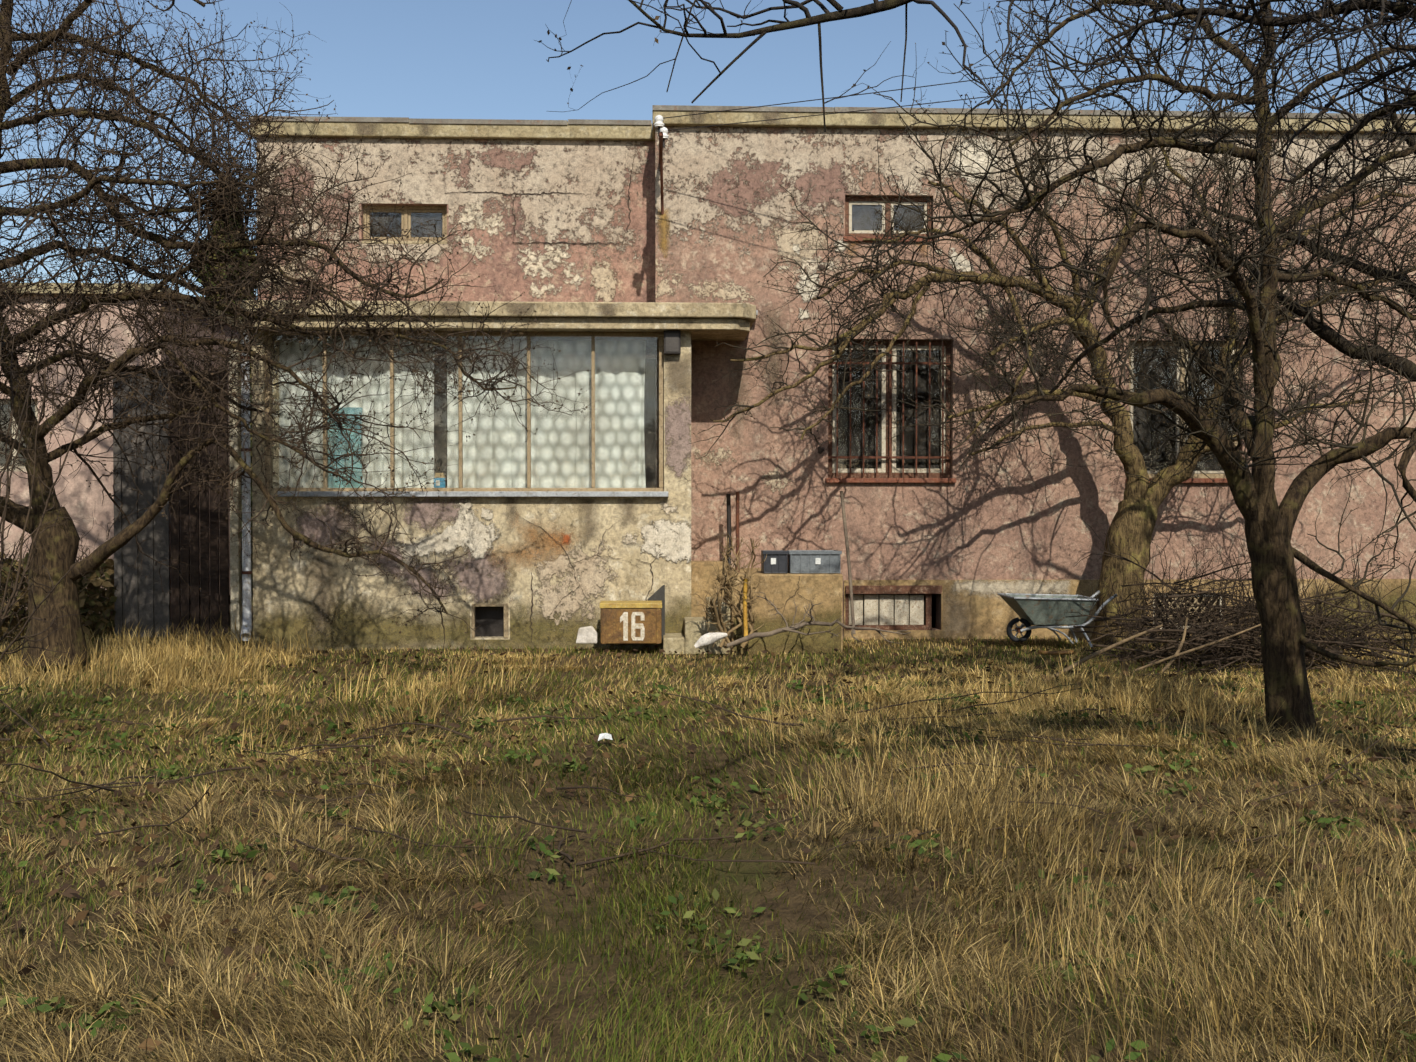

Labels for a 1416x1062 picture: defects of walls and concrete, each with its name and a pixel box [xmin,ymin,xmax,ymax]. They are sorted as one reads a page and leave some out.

peeling [256,126,1416,321]
peeling [391,501,500,573]
peeling [524,502,691,632]